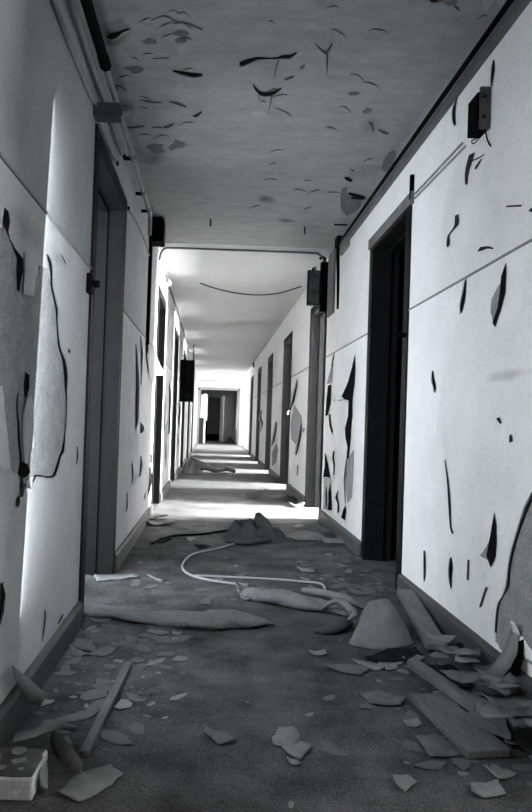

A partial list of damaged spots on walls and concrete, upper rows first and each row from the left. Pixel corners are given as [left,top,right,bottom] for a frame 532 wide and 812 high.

peeling [491,284,500,320]
peeling [0,208,70,508]
peeling [136,336,165,433]
peeling [165,385,180,468]
flaking render [287,380,302,455]
peeling [323,354,355,520]
peeling [493,490,532,665]